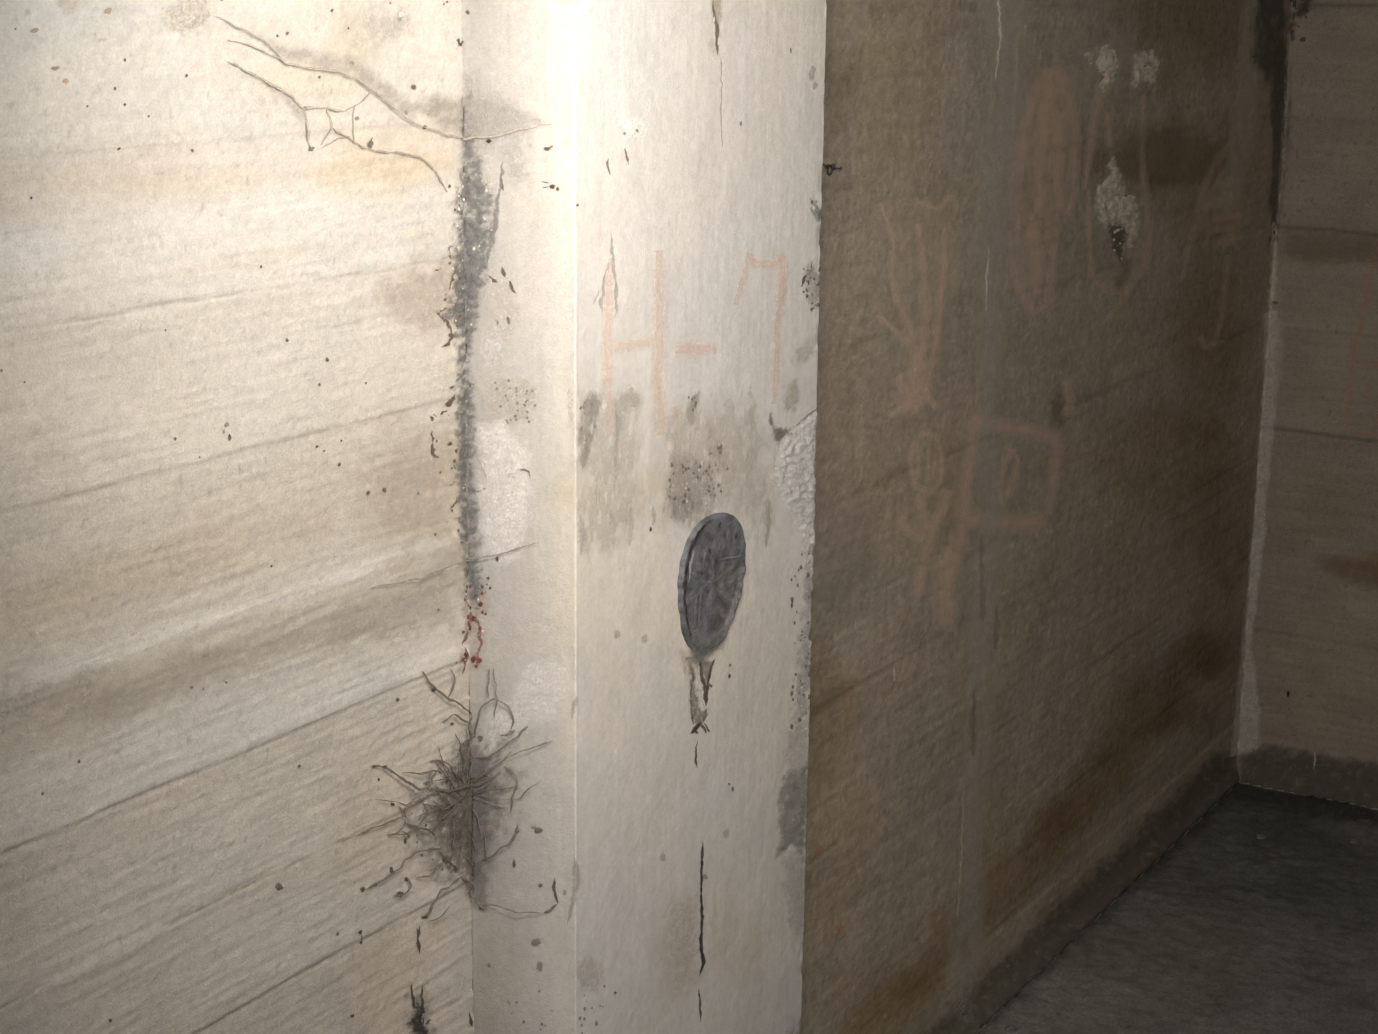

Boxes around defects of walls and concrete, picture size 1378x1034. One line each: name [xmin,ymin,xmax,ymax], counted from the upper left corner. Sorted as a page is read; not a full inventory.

crack [712,0,723,147]
leakage [293,76,536,647]
leakage [924,0,1378,1034]
corrosion [456,577,491,674]
crack [408,926,431,1034]
crack [671,842,708,1022]